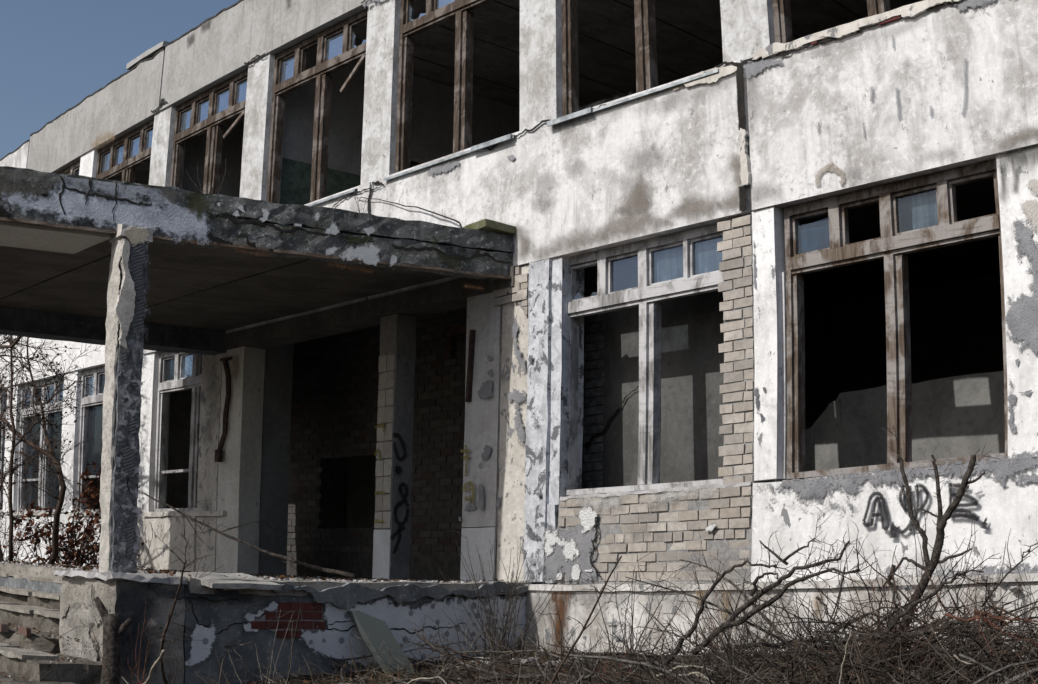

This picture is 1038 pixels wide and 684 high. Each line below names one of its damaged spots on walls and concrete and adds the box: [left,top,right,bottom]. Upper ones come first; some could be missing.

peeling [900,0,995,18]
crack [59,176,152,225]
peeling [315,212,397,266]
water stain [517,156,741,257]
peeling [1004,179,1038,365]
peeling [507,280,533,372]
peeling [0,176,233,570]
peeling [478,356,539,449]
peeling [1007,379,1032,433]
peeling [757,448,1038,514]
peeling [244,504,600,669]
peeling [185,624,216,666]